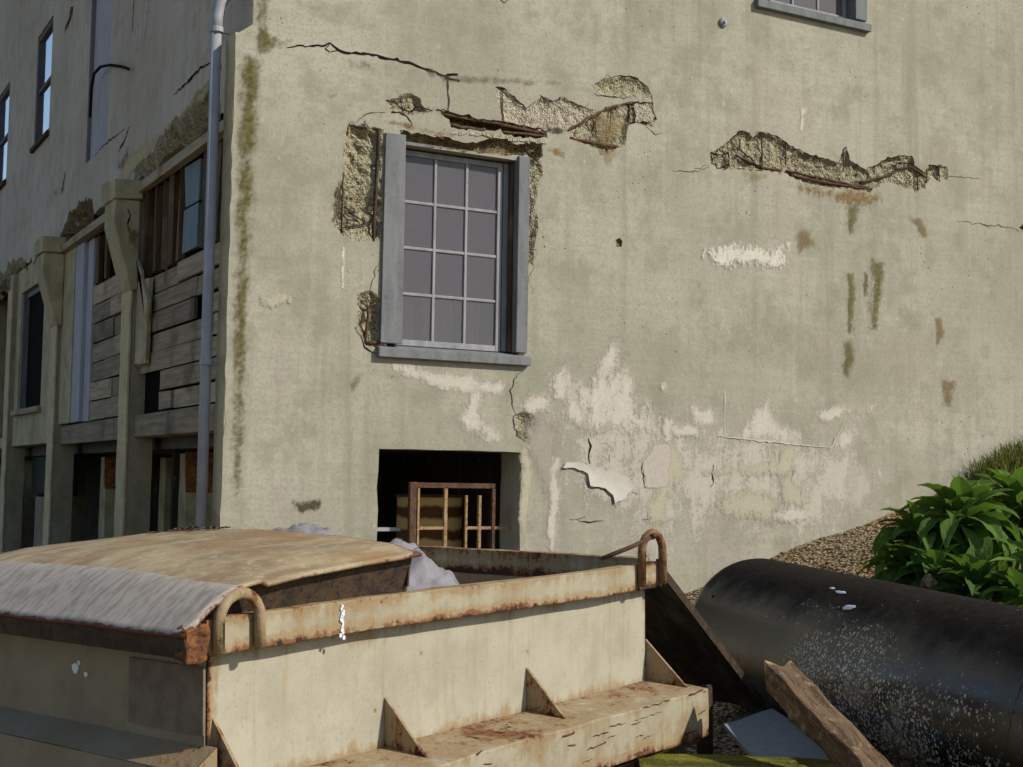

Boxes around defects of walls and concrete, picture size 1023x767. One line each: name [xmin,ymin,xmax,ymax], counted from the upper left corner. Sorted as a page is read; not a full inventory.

crack [174,62,210,95]
crack [287,42,458,76]
spalling [122,80,222,180]
spalling [332,75,657,287]
spalling [695,130,949,193]
spalling [0,257,28,299]
spalling [355,260,385,354]
water stain [702,232,811,270]
water stain [844,261,883,376]
peeling [513,408,537,533]
peeling [547,443,671,552]
peeling [708,488,811,535]